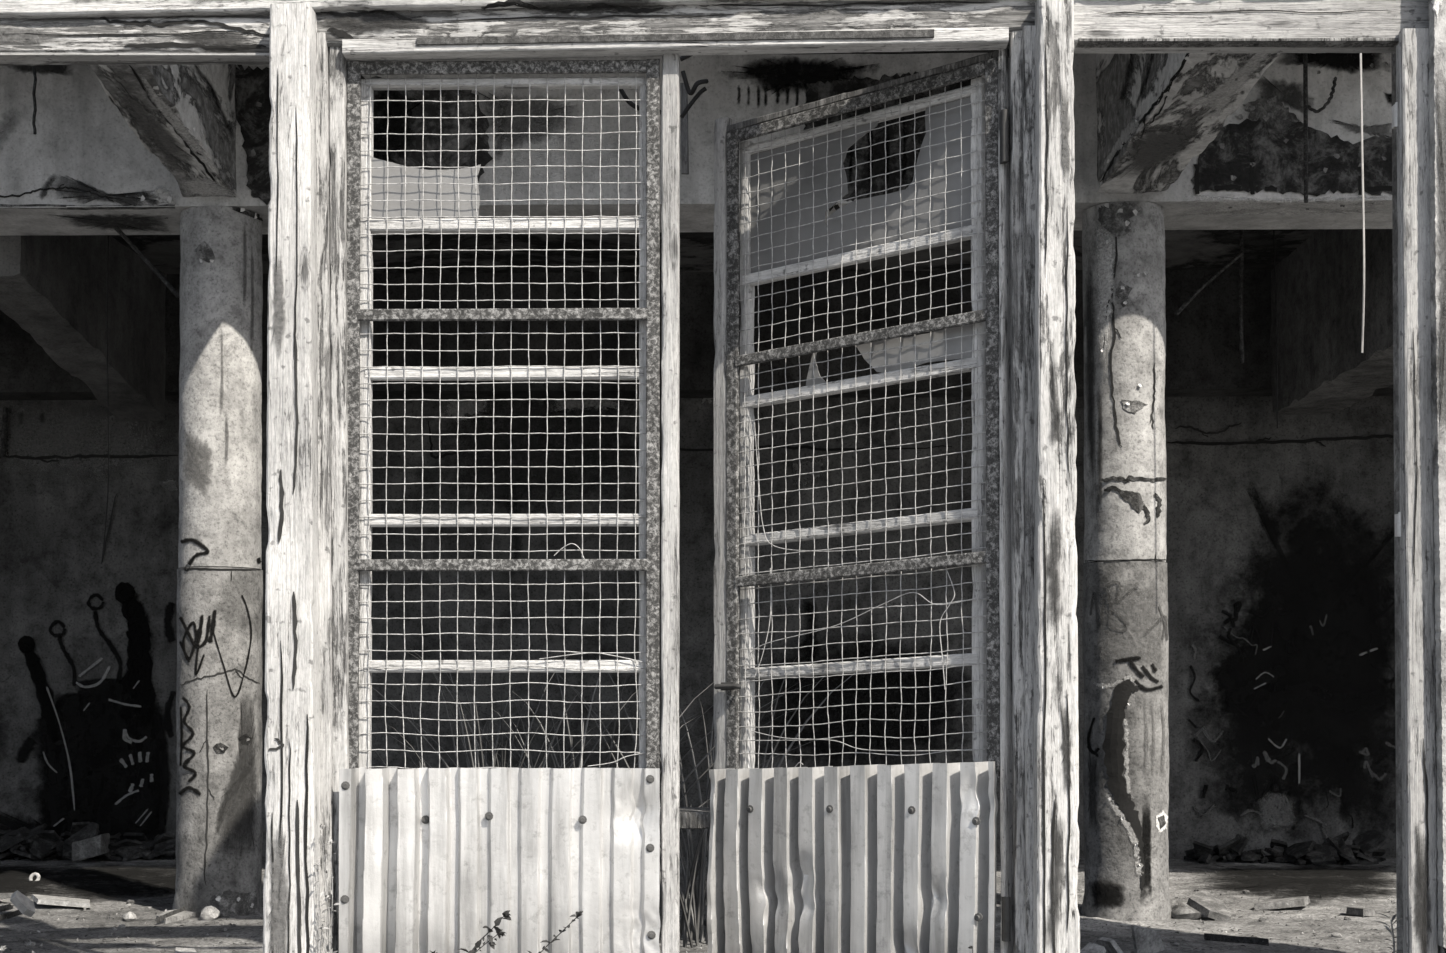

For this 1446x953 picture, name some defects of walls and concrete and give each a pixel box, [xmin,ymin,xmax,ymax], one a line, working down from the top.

peeling [481,0,663,14]
peeling [1431,0,1443,18]
spalling [75,0,272,221]
peeling [1104,117,1138,172]
spalling [1176,53,1392,215]
peeling [1414,834,1431,953]